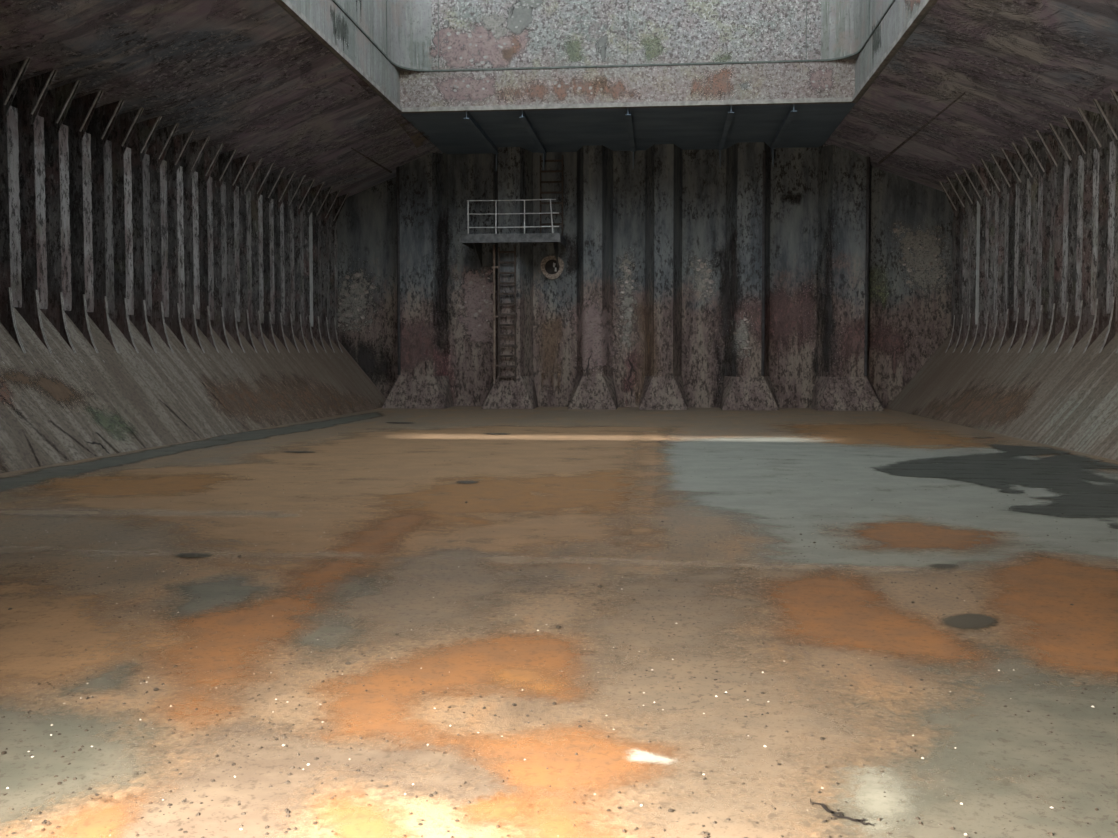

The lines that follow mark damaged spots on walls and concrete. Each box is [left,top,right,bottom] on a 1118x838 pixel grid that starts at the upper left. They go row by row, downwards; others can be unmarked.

peeling [429,0,544,69]
corrosion [498,76,635,102]
corrosion [691,67,734,100]
corrosion [9,425,682,584]
damp [617,432,1118,573]
corrosion [835,521,1011,551]
corrosion [987,553,1118,673]
damp [572,566,1118,838]